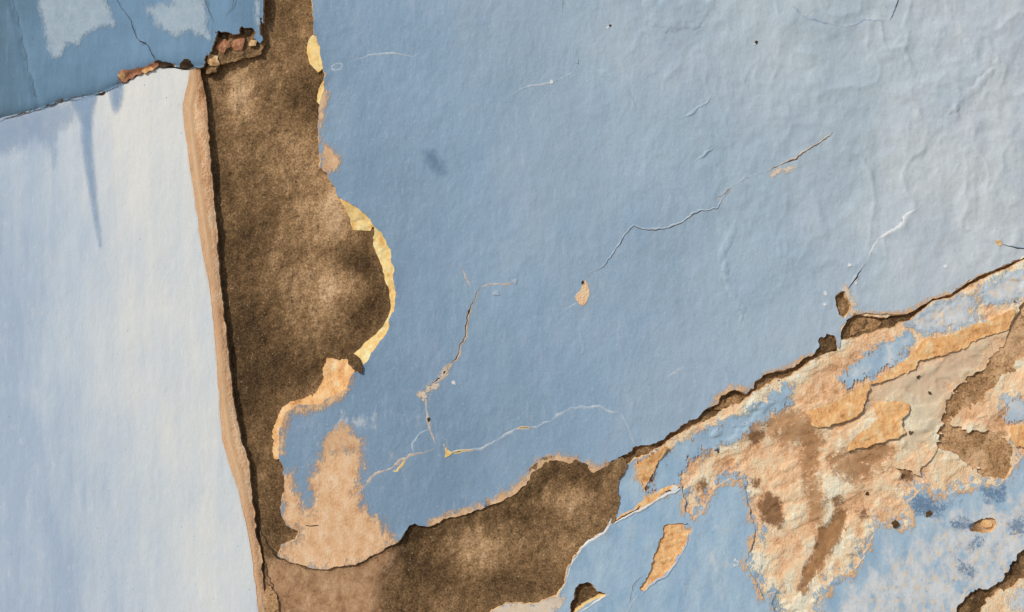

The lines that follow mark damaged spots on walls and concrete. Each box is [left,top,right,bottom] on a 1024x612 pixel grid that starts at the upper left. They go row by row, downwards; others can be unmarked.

spalling [117,62,159,83]
spalling [146,0,628,612]
crack [357,207,1024,495]
crack [563,132,833,359]
flaking render [627,256,1024,612]